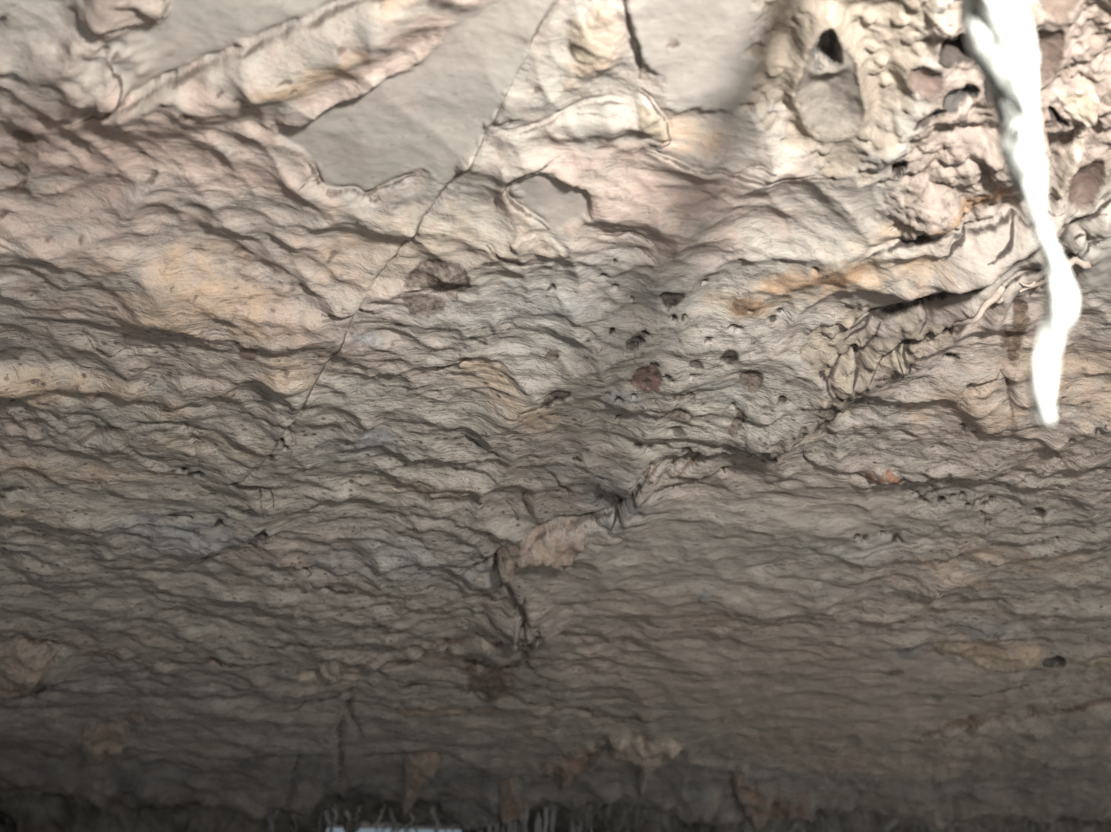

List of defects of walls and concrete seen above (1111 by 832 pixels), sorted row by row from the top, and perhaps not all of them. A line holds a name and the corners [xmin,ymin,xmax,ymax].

crack [95,24,153,109]
crack [376,13,548,278]
crack [304,314,353,405]
crack [437,338,488,369]
crack [819,324,881,404]
crack [902,339,921,380]
crack [1000,368,1014,416]
crack [228,427,293,516]
crack [507,490,542,519]
crack [547,456,582,498]
crack [595,453,747,546]